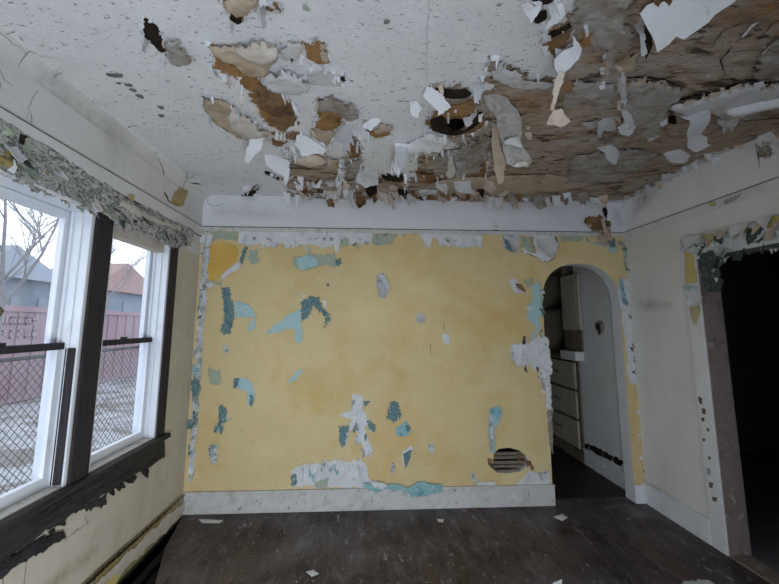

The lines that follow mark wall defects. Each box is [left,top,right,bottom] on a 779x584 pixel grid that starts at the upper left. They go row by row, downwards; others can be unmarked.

spalling [106,73,144,99]
peeling [204,0,779,394]
peeling [0,118,483,482]
flaking render [509,277,554,454]
peeling [81,467,149,512]
peeling [290,393,443,498]
spalling [470,406,550,486]
peeling [585,443,623,474]
crack [86,495,184,584]
peeling [96,501,185,584]